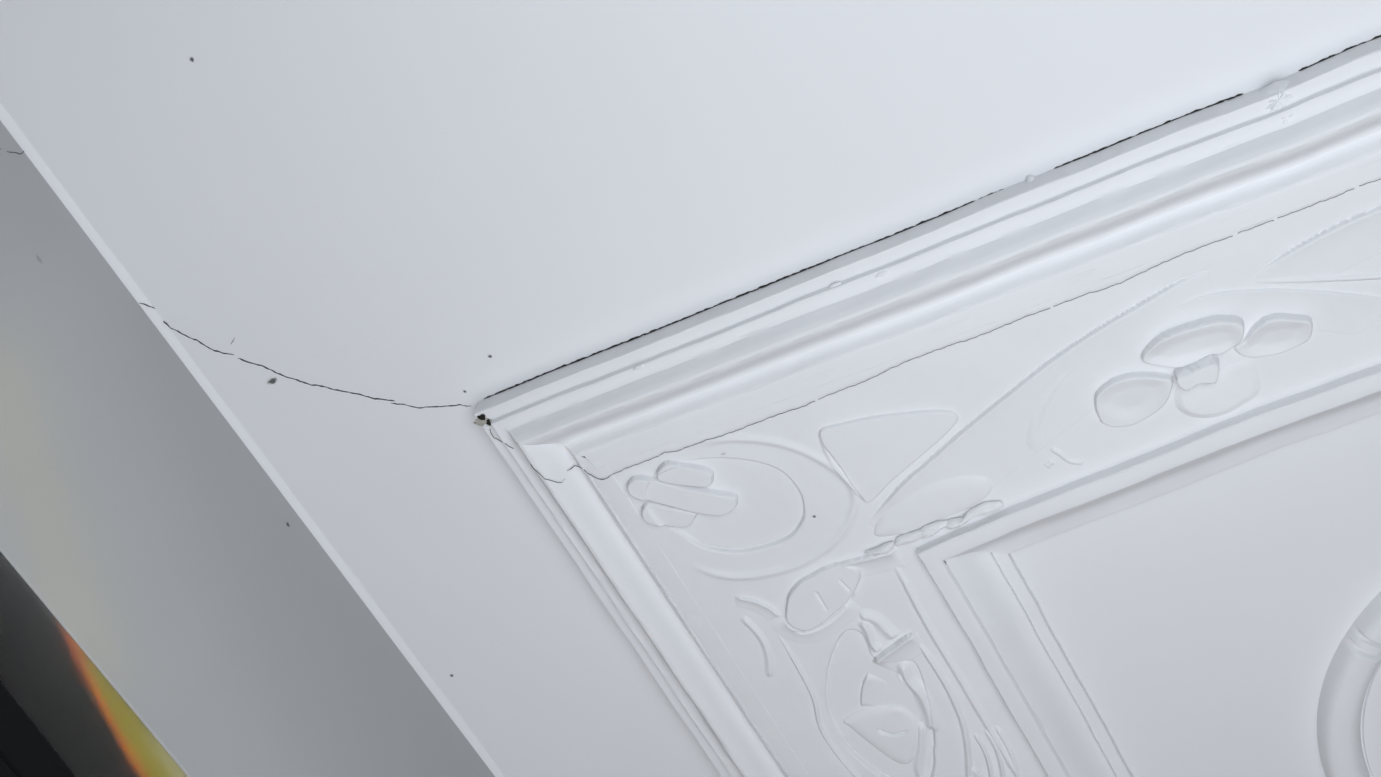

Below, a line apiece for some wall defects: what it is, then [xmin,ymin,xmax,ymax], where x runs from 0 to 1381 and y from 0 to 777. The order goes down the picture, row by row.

crack [1298,35,1381,71]
crack [1054,94,1243,169]
crack [140,179,1380,483]